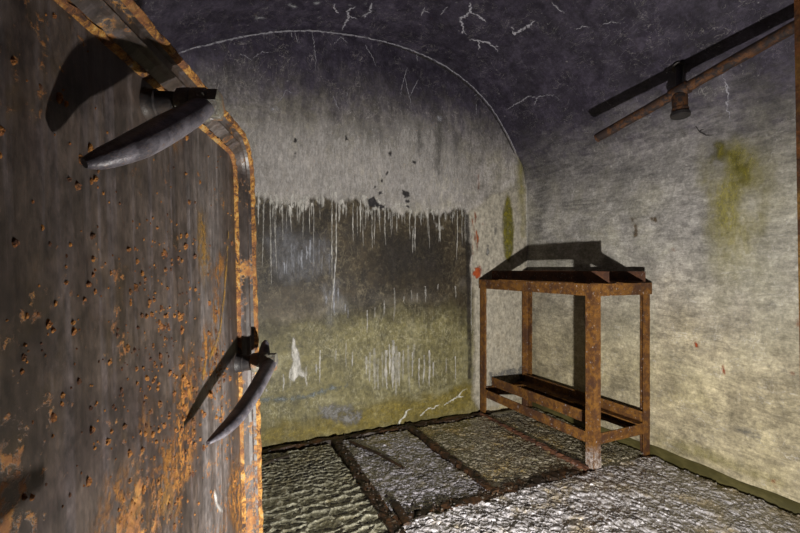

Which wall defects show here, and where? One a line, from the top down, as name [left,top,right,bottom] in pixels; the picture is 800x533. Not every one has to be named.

crack [179,3,558,154]
rust [89,220,233,532]
crack [397,392,463,426]
leakage [255,195,800,533]